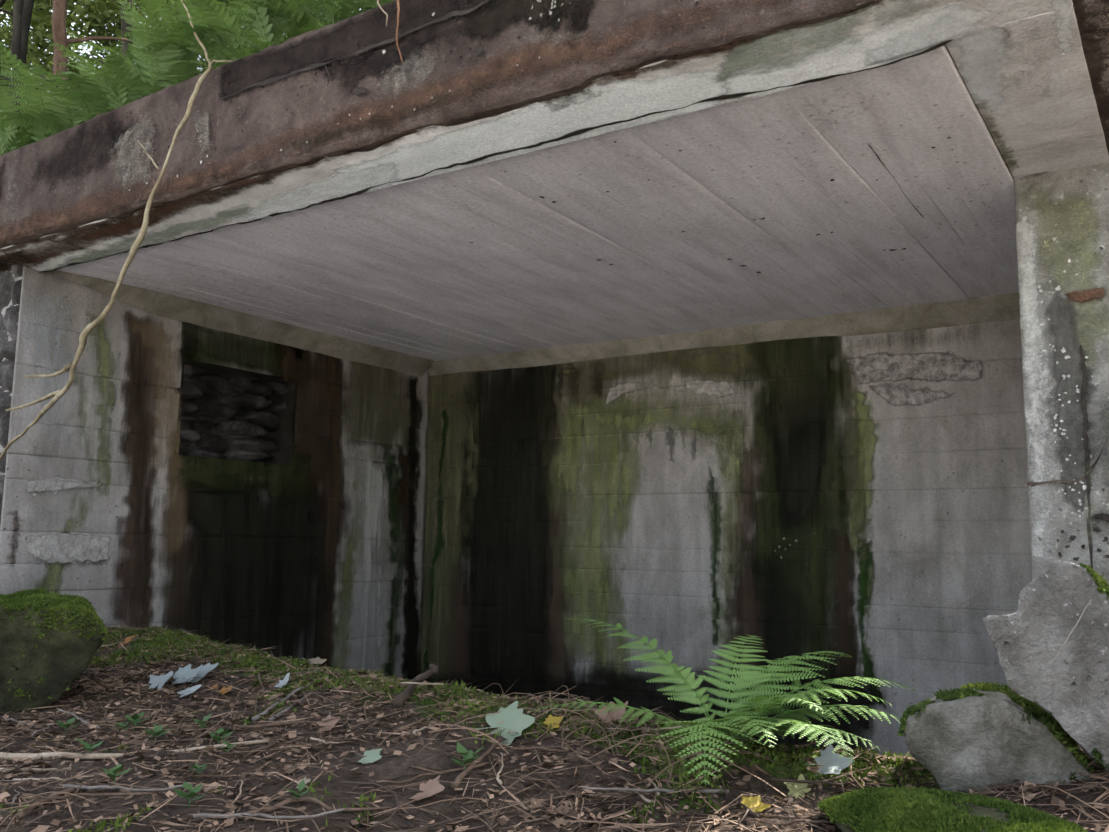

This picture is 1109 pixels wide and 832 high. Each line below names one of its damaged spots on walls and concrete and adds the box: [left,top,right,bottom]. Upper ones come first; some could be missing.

rust [0,0,828,271]
crack [41,40,953,272]
peeling [27,533,111,564]
damp [162,321,884,753]
spalling [847,352,983,406]
crack [1027,345,1102,568]